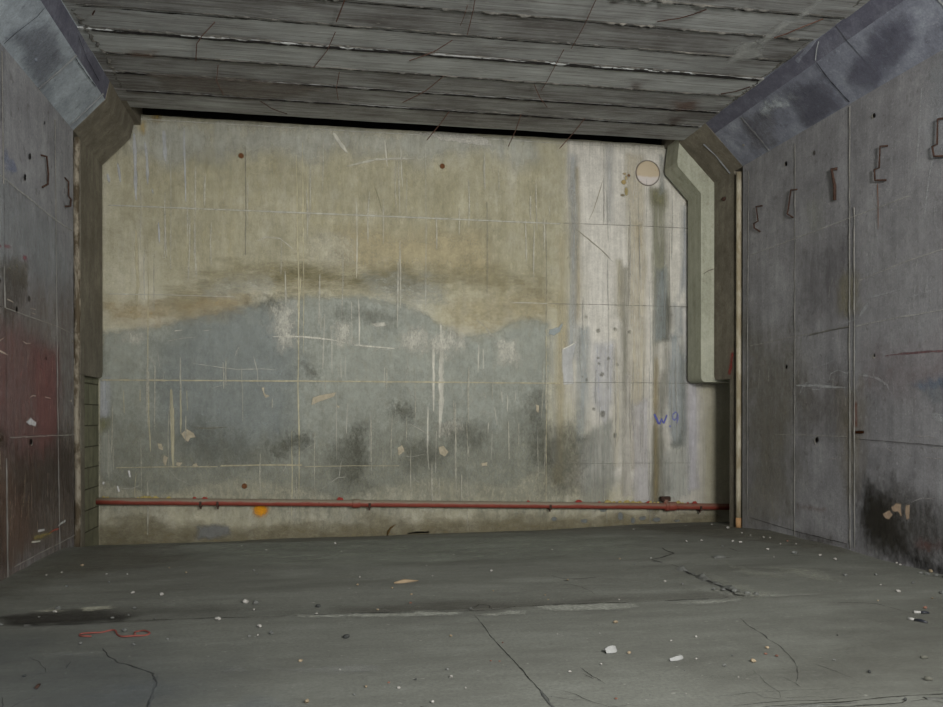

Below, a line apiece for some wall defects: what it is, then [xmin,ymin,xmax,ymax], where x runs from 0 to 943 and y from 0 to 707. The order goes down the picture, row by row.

damp [101,122,703,519]
damp [863,487,943,573]
crack [652,548,744,601]
crack [102,648,158,707]
crack [467,576,631,707]
crack [725,624,943,707]